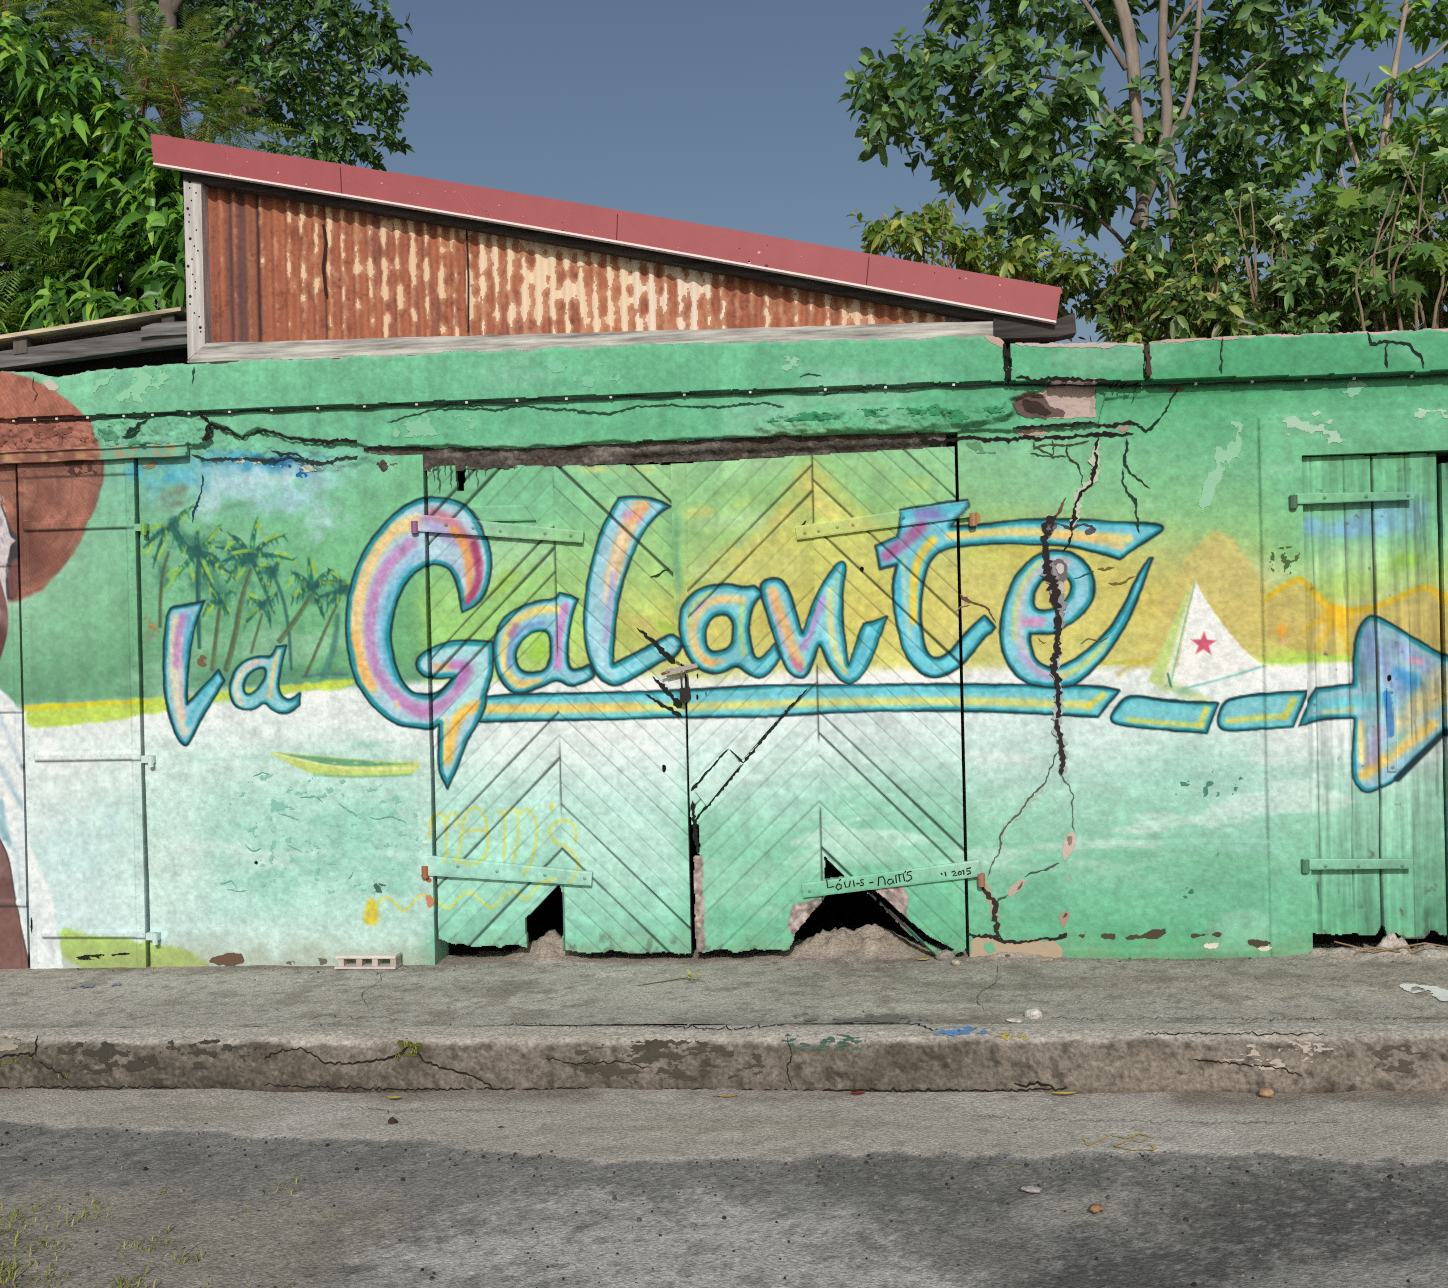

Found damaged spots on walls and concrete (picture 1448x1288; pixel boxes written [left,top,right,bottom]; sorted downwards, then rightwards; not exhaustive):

crack [1367,332,1424,368]
crack [388,373,869,422]
spalling [1012,376,1097,436]
crack [919,343,1179,944]
crack [0,1035,180,1090]